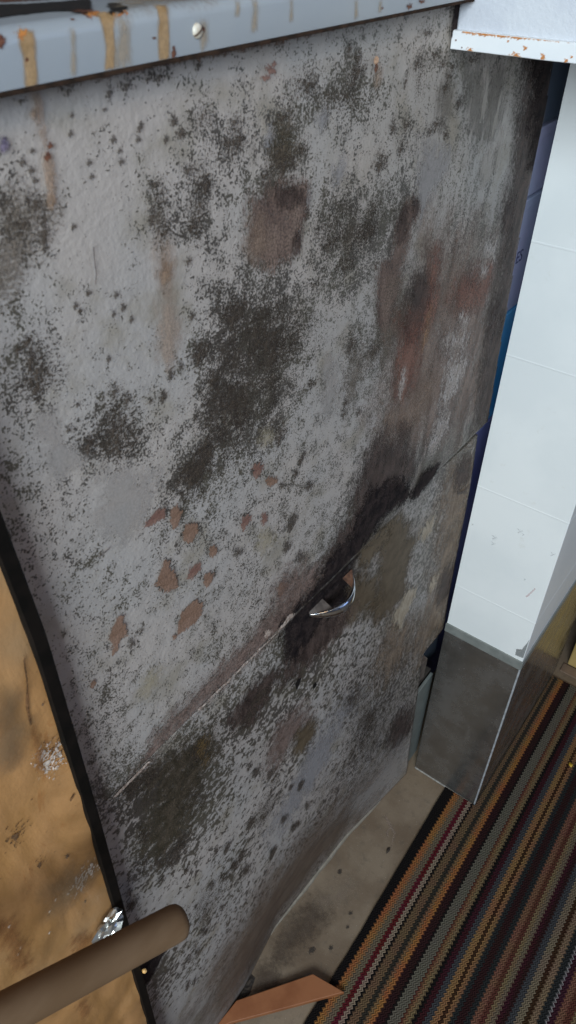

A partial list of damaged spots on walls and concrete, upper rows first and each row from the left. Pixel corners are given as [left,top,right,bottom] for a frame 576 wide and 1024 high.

rust [0,28,37,87]
rust [71,5,334,81]
rust [455,31,559,57]
water stain [103,65,173,112]
water stain [0,142,76,309]
water stain [3,313,71,413]
peeling [251,462,278,488]
peeling [145,505,198,544]
water stain [120,24,554,1020]
peeling [154,545,218,593]
peeling [108,615,128,656]
peeling [172,599,203,640]